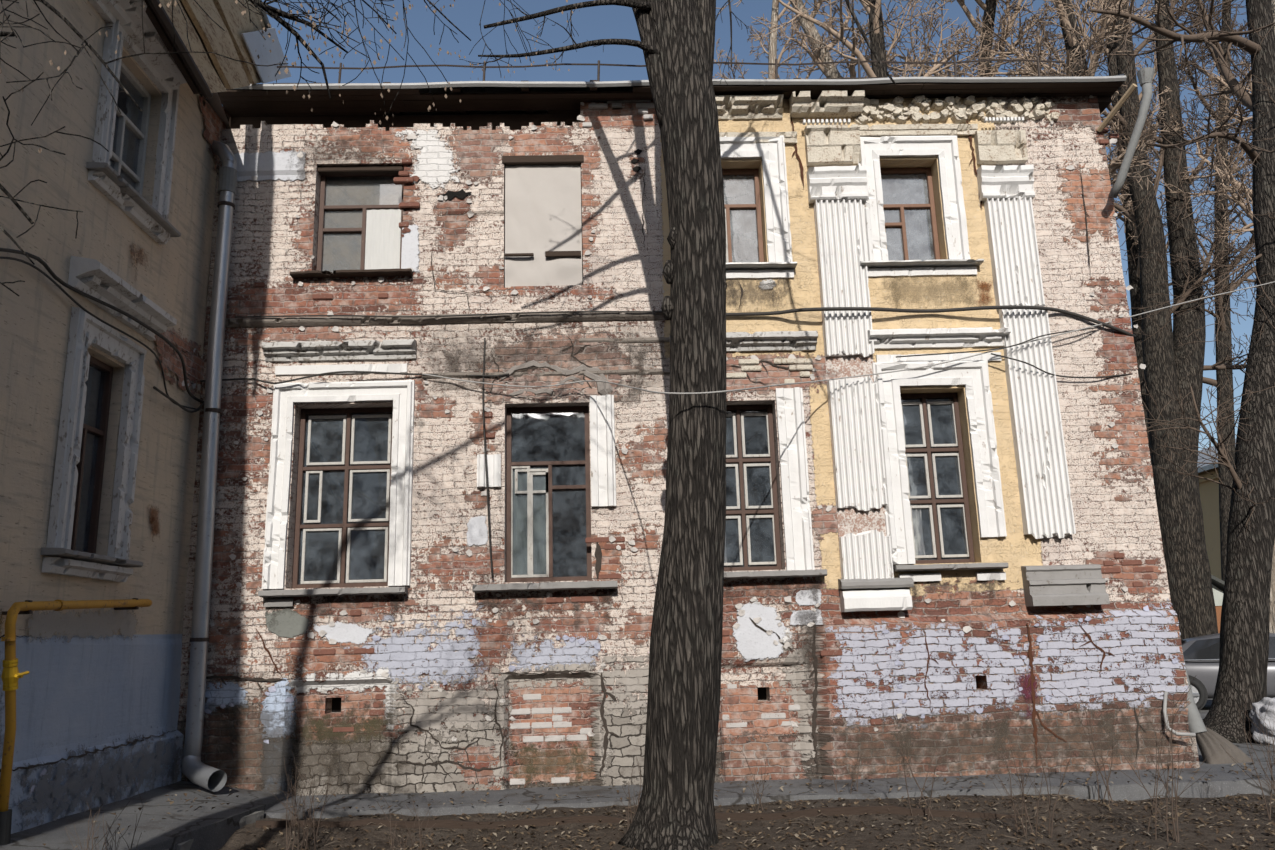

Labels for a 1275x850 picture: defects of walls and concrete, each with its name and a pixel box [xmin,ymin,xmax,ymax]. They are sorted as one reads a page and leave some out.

flaking render [224,99,658,351]
flaking render [1042,95,1119,247]
flaking render [153,328,204,397]
flaking render [1081,276,1155,501]
corrosion [150,506,160,534]
crack [0,730,176,772]
peeling [201,513,662,796]
crack [399,670,619,786]
flaking render [717,546,1194,783]